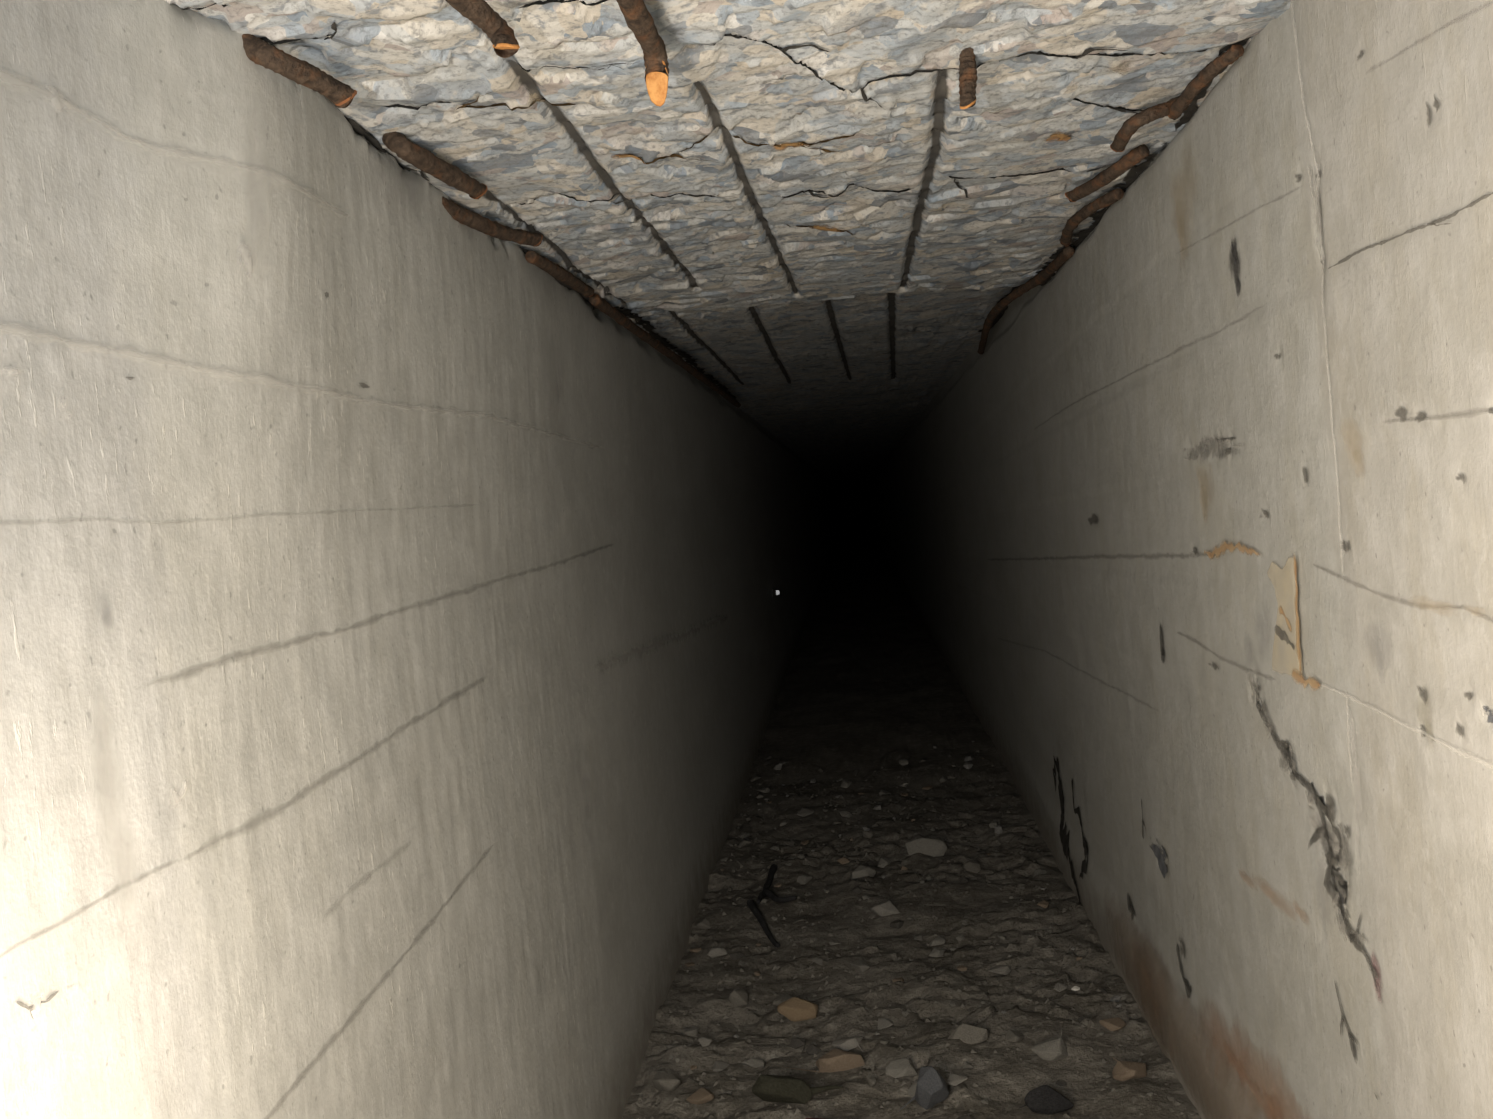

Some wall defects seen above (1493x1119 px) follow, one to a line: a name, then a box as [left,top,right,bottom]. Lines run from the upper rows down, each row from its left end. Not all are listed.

spalling [242,34,357,108]
spalling [445,0,520,58]
crack [519,0,608,8]
spalling [616,0,669,107]
spalling [959,47,978,109]
spalling [382,131,741,407]
rust [773,142,806,150]
crack [519,33,1250,332]
spalling [977,44,1244,355]
crack [1318,193,1493,271]
crack [1053,756,1088,904]
crack [1255,690,1378,981]